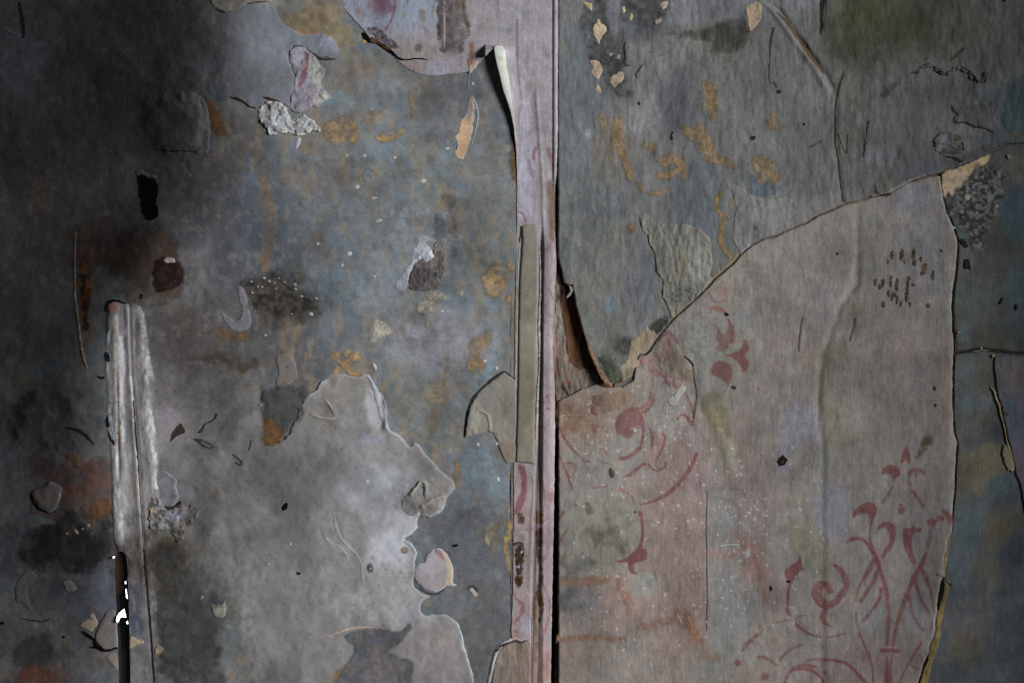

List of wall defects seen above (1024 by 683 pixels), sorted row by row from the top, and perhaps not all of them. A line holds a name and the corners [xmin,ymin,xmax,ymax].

peeling [210,0,415,146]
flaking render [136,169,159,220]
rust [69,222,186,331]
peeling [464,371,517,463]
crack [684,356,698,423]
peeling [148,350,479,683]